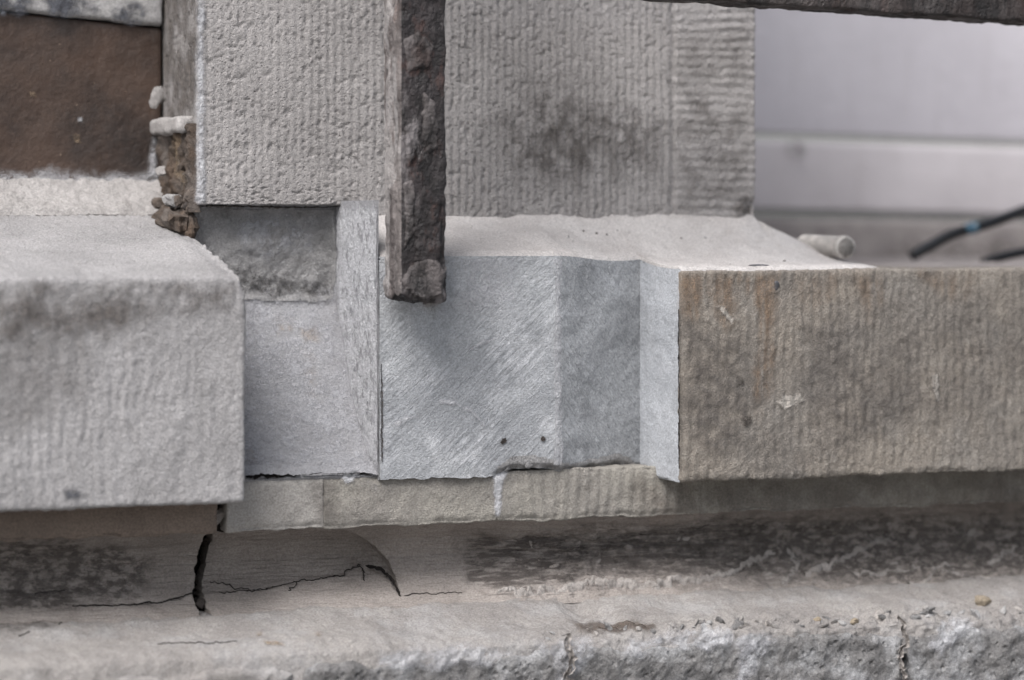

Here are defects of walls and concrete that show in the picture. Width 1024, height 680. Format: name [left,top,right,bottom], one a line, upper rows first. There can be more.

rust [400,32,435,72]
rust [404,92,439,167]
rust [400,186,447,305]
crack [35,504,462,625]